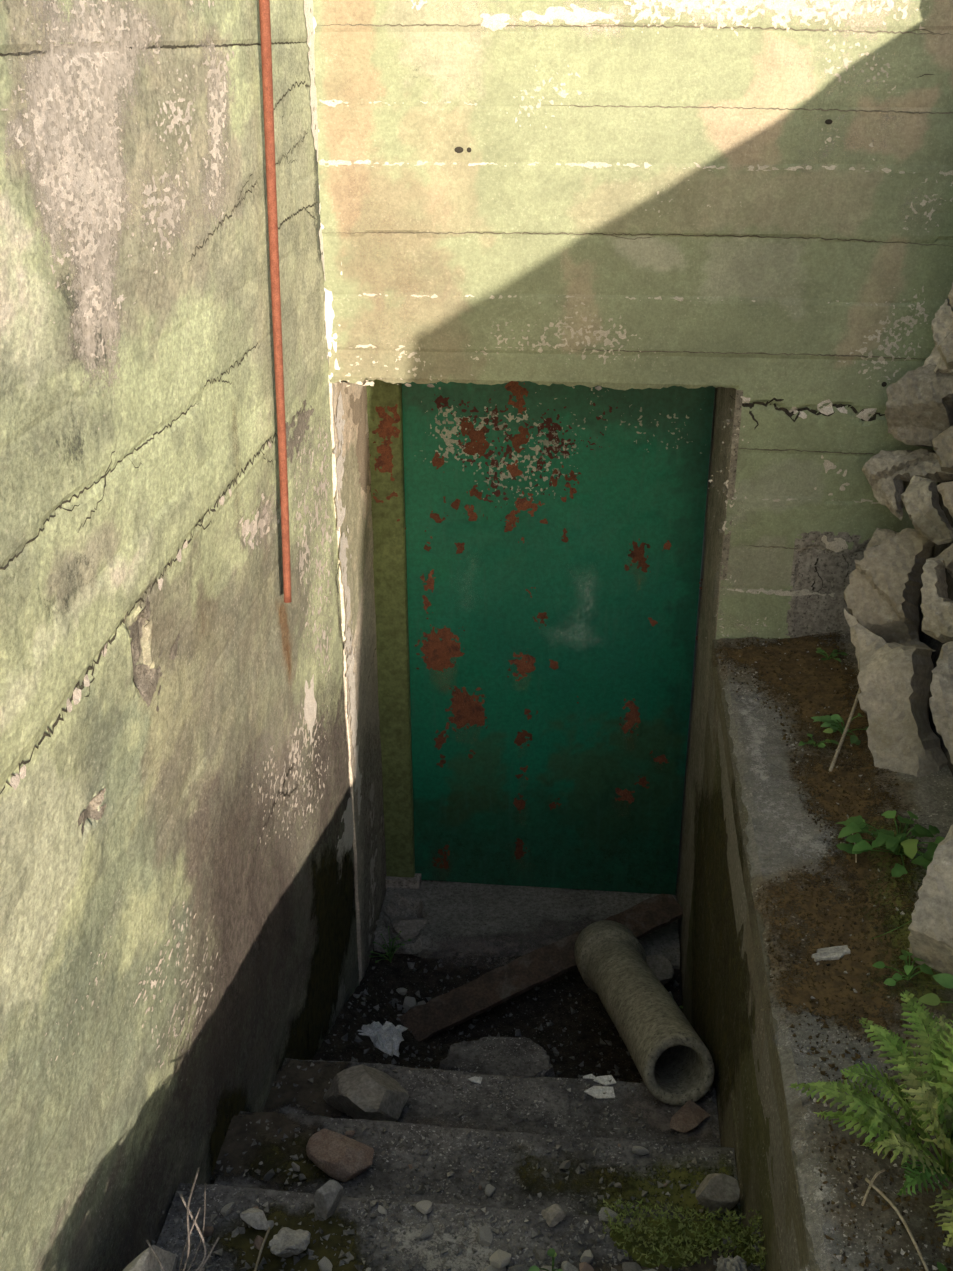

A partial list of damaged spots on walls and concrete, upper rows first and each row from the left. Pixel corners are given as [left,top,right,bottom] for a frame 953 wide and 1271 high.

peeling [480,0,930,93]
damp [59,273,109,370]
crack [0,344,260,570]
corrosion [456,417,489,458]
corrosion [503,381,548,543]
crack [730,395,885,455]
corrosion [424,480,490,552]
crack [0,420,286,794]
spalling [129,597,181,712]
corrosion [415,569,465,673]
peeling [715,531,871,639]
corrosion [434,686,488,768]